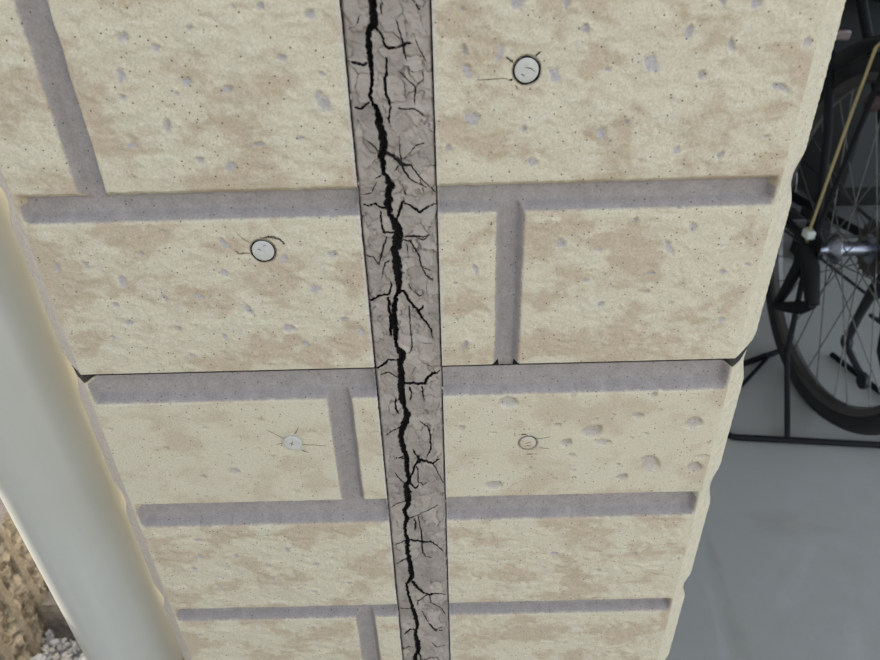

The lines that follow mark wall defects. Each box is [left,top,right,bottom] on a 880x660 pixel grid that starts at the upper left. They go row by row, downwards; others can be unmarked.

crack [339,0,450,660]